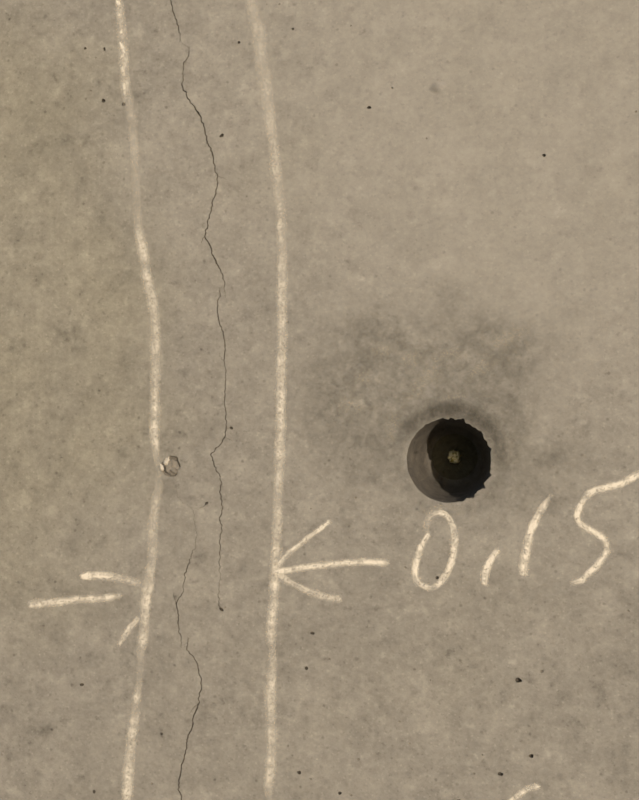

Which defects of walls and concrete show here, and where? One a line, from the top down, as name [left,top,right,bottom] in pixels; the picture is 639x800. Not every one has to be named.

crack [170,0,230,800]